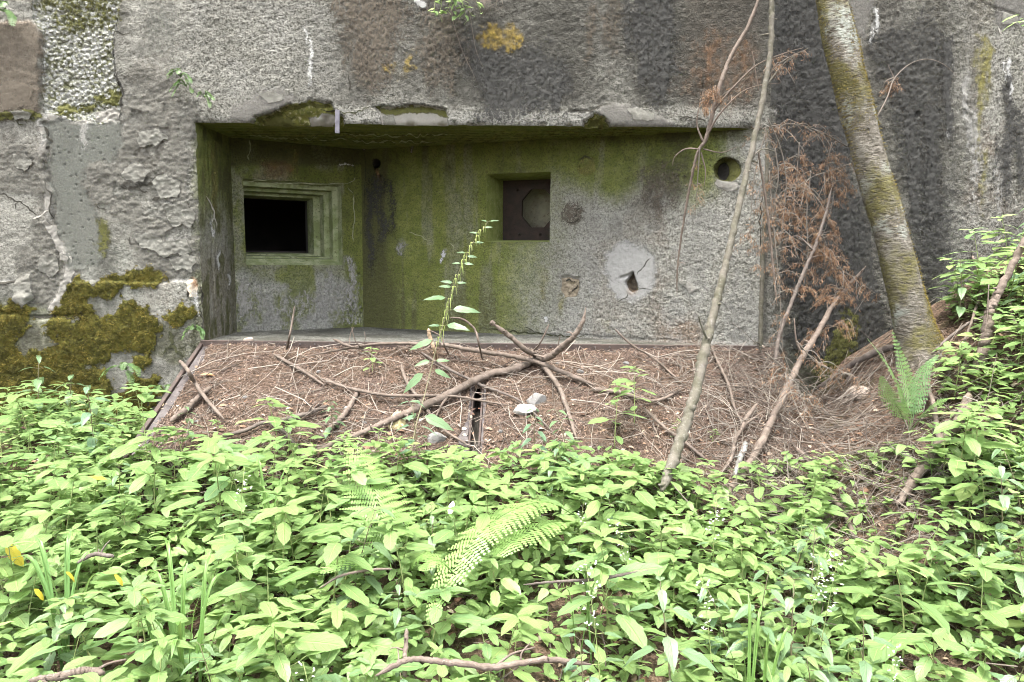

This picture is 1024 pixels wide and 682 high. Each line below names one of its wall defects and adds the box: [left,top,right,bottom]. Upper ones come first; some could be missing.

spalling [231,89,344,127]
spalling [373,104,448,126]
flaking render [0,0,201,309]
water stain [216,174,426,332]
spalling [603,239,657,302]